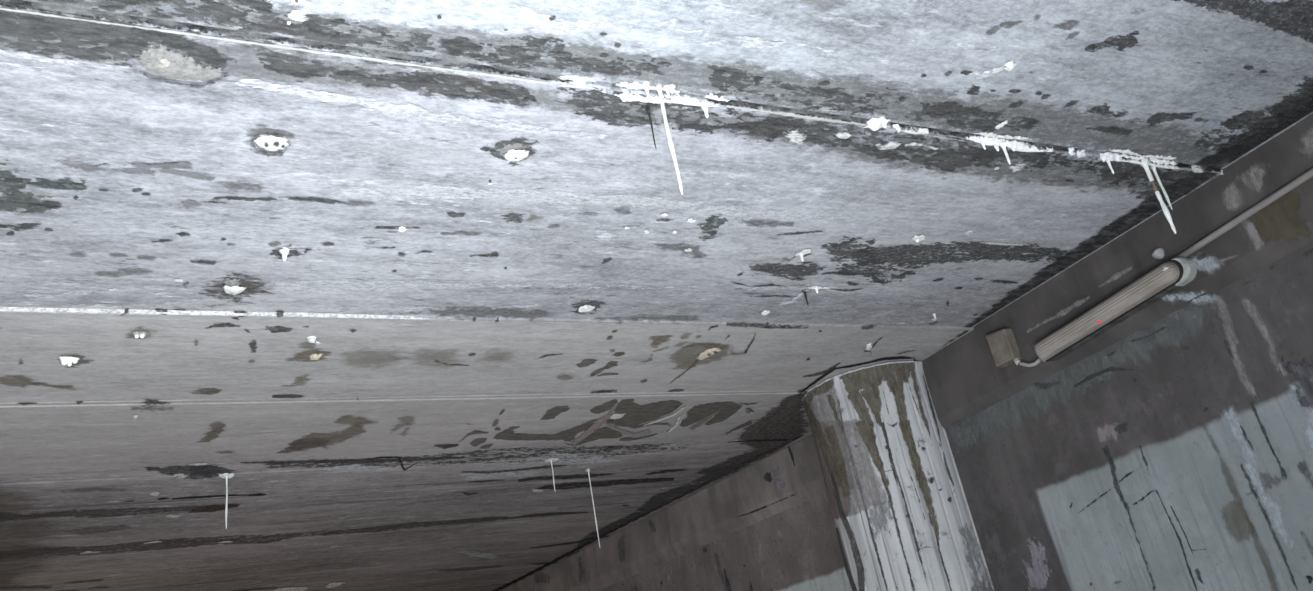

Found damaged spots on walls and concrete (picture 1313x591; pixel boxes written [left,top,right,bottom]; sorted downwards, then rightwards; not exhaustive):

spalling [135,45,228,88]
spalling [671,334,728,383]
water stain [277,416,377,453]
peeling [450,399,757,451]